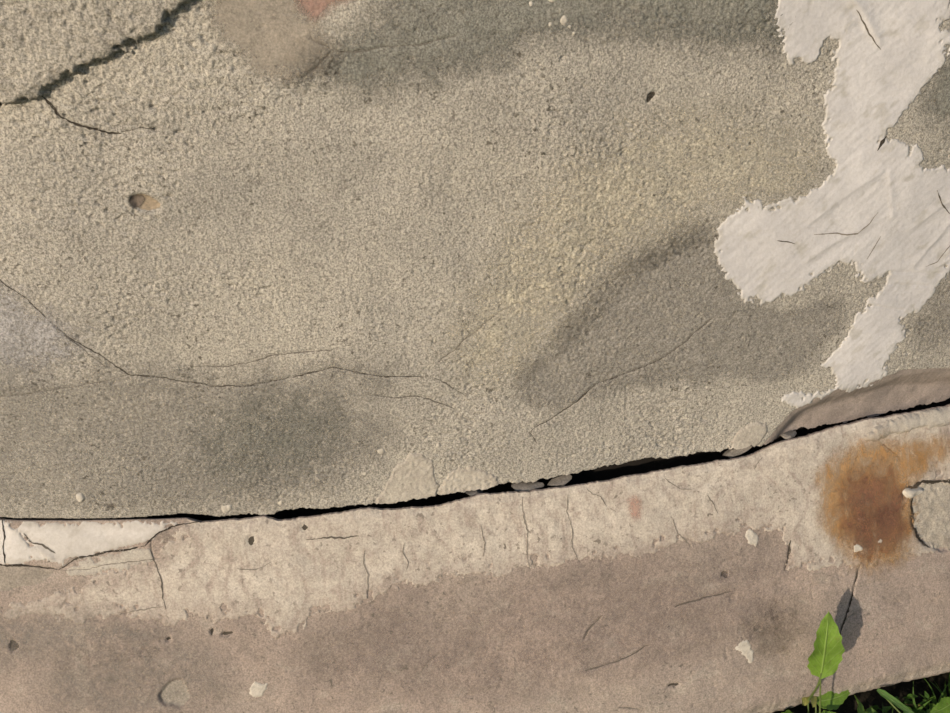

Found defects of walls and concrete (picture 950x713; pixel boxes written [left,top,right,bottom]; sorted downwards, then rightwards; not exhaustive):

peeling [0,0,196,107]
crack [42,96,154,134]
crack [0,280,508,409]
peeling [0,368,950,640]
crack [0,398,950,615]
corrosion [824,442,940,566]
crack [840,565,860,635]